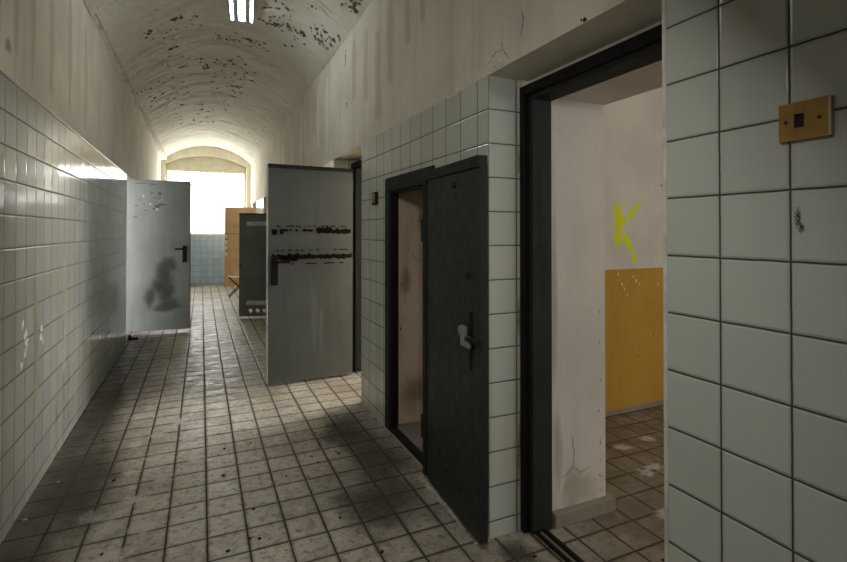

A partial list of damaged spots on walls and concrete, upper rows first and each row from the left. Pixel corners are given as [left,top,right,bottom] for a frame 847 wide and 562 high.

peeling [143,15,202,66]
peeling [179,56,257,123]
peeling [257,0,341,50]
damp [349,0,427,125]